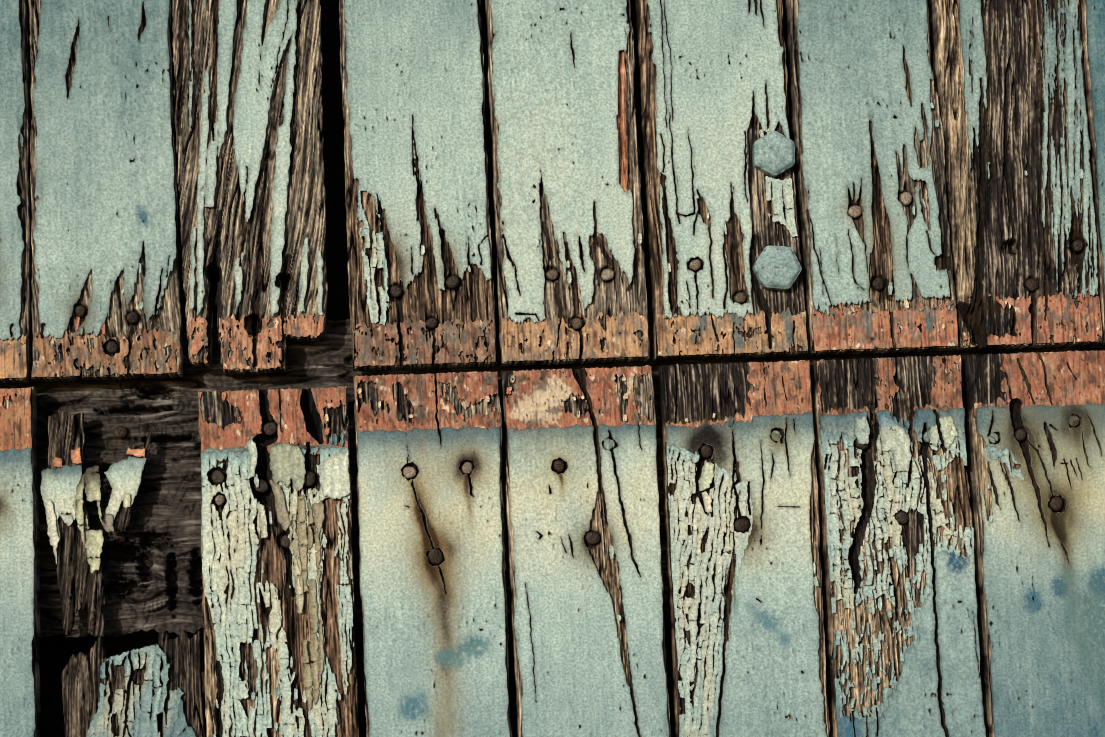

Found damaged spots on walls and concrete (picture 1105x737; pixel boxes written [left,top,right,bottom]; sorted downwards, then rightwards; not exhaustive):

peeling [43,465,114,573]
peeling [91,0,327,377]
peeling [244,488,359,737]
peeling [321,142,515,446]
corrosion [412,482,457,676]
corrosion [453,451,482,502]
crack [356,124,641,737]
crack [568,34,576,68]
crack [638,0,1102,737]
peeling [835,508,924,714]
peeling [829,0,1100,315]
corrosion [1005,413,1077,565]